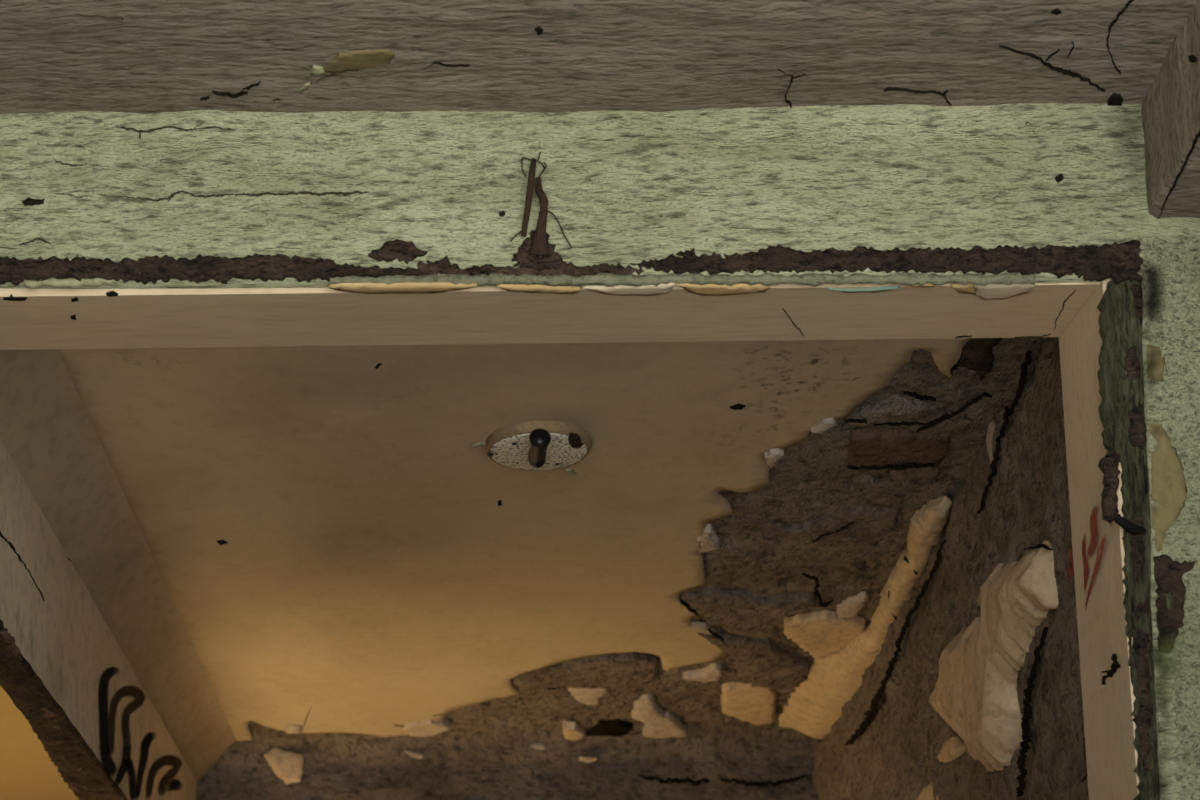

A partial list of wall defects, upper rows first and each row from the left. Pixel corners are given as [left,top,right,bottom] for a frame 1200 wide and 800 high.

crack [999,0,1134,92]
crack [1158,130,1200,219]
crack [0,531,44,601]
spalling [403,337,1046,759]
spalling [0,619,116,800]
spalling [248,720,341,784]